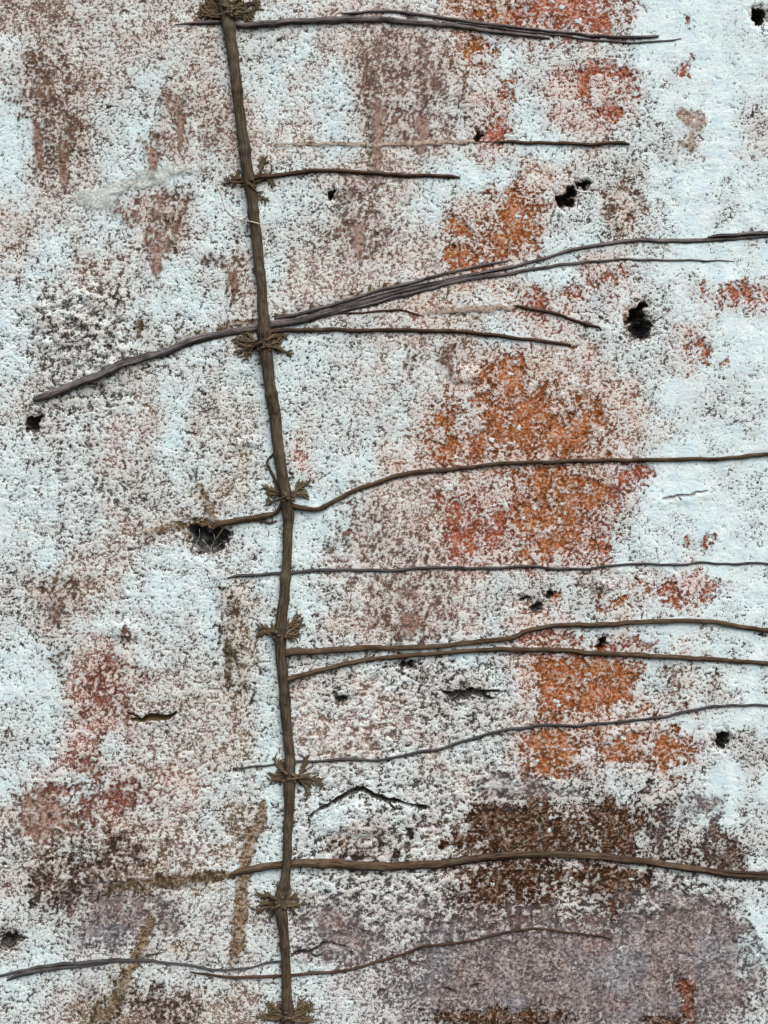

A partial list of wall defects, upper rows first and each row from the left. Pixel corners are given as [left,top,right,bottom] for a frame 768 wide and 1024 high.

crack [442,687,500,702]
crack [129,711,177,722]
crack [309,786,428,818]